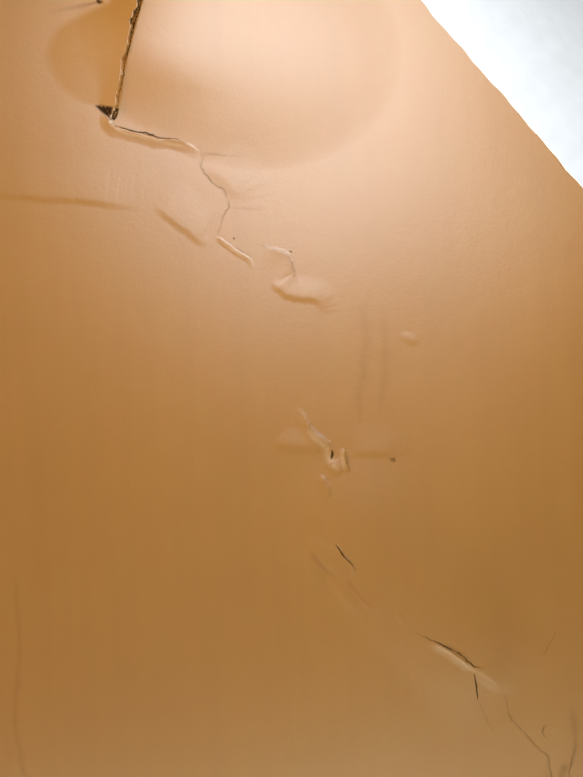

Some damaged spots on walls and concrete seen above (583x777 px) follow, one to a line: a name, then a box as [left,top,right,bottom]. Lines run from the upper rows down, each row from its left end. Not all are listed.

crack [44,0,278,202]
crack [260,244,296,278]
crack [425,639,523,698]